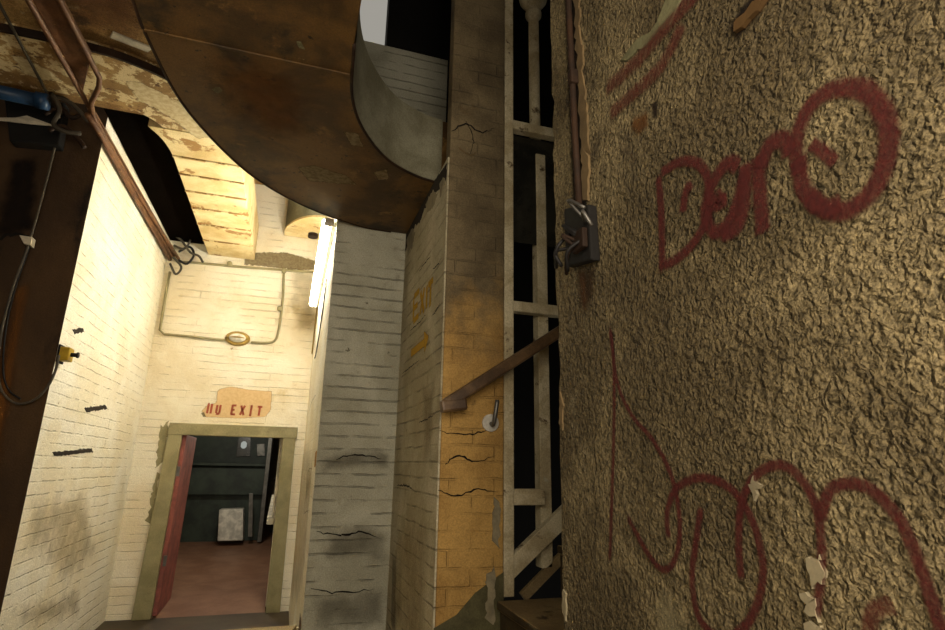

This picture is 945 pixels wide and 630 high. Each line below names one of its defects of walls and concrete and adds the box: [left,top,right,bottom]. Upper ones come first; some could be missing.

peeling [620,0,682,62]
peeling [11,56,61,82]
peeling [126,81,209,139]
crack [419,414,499,465]
crack [336,453,380,461]
peeling [145,421,169,523]
crack [438,488,496,497]
spalling [748,476,764,501]
crack [305,510,376,537]
crack [311,587,373,595]
spalling [799,554,828,630]